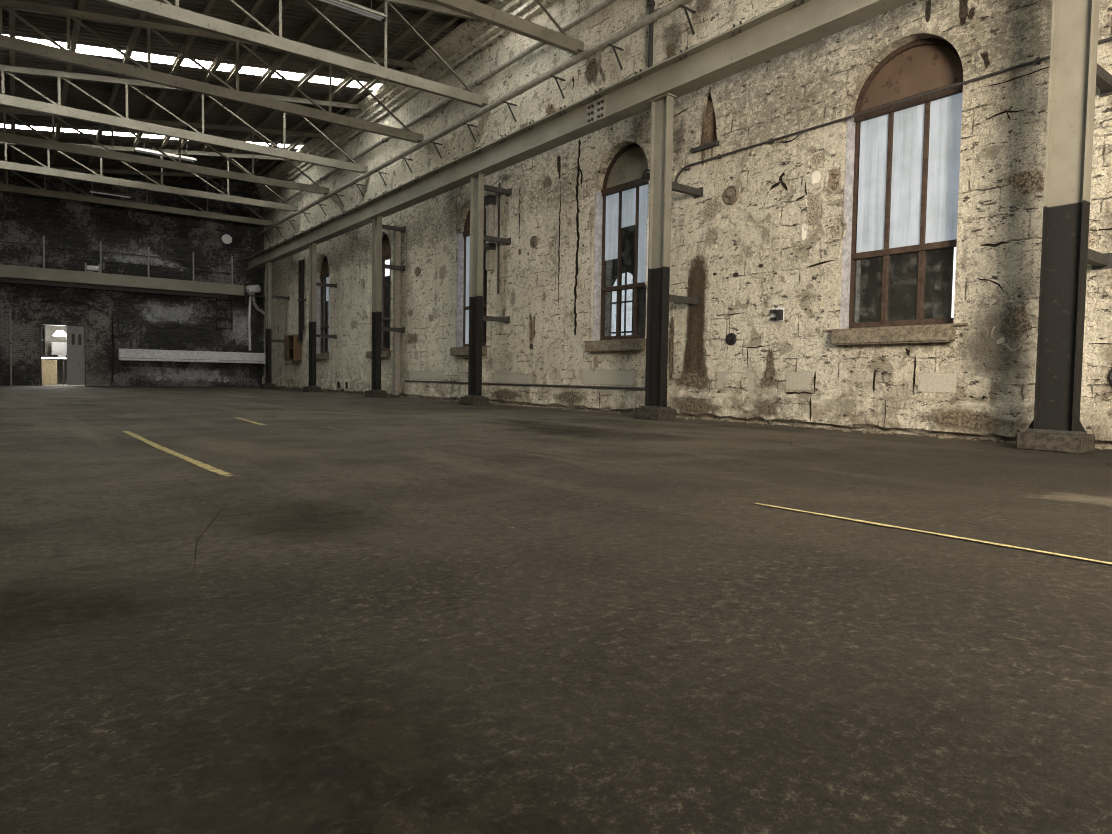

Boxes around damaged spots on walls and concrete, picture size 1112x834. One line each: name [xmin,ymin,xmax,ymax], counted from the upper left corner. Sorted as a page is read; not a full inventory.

crack [558,140,583,335]
rust [668,255,722,414]